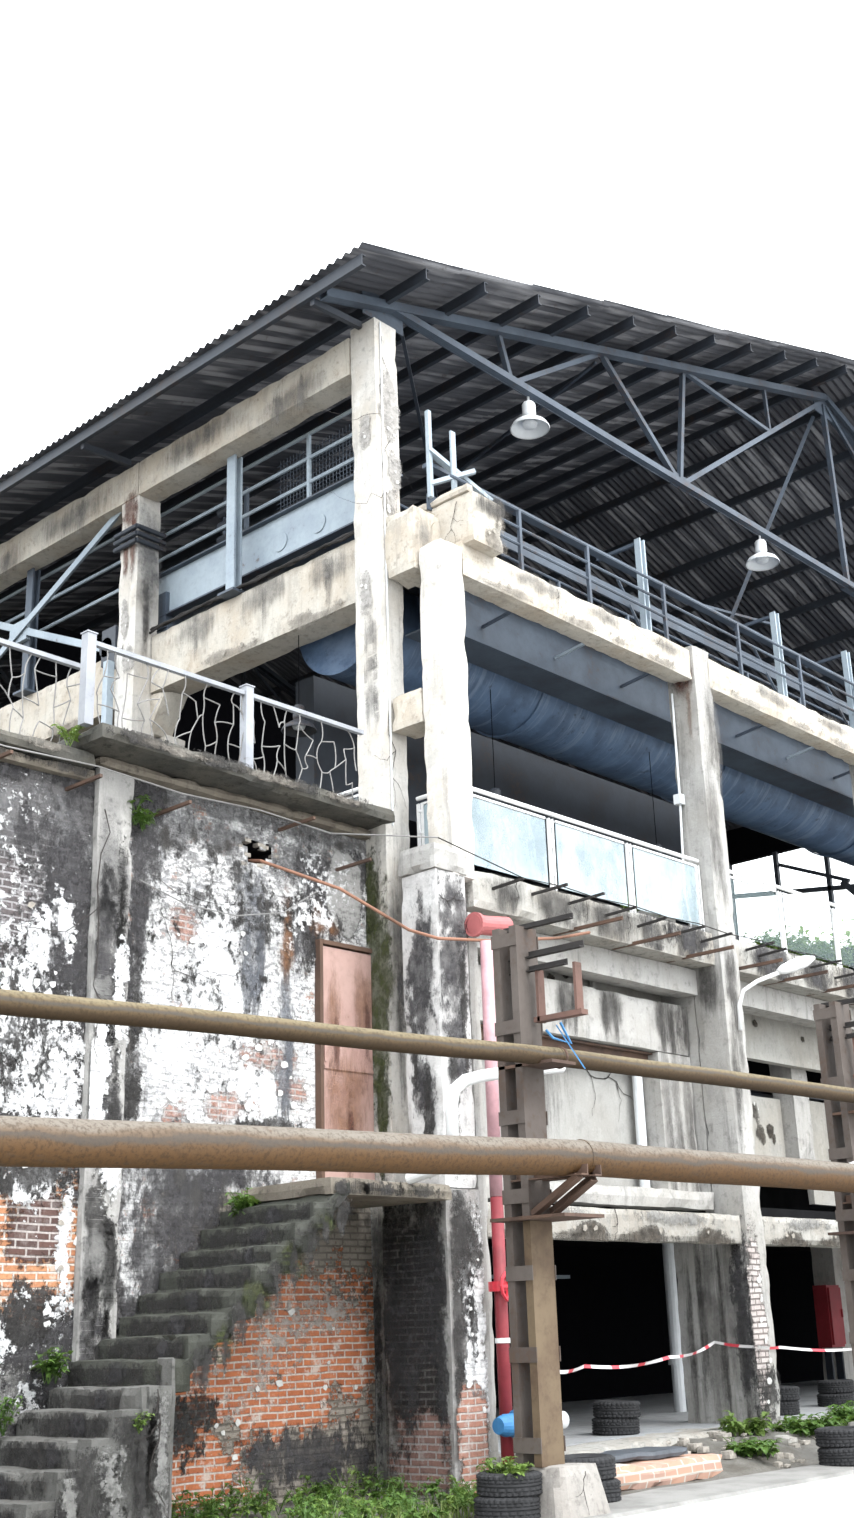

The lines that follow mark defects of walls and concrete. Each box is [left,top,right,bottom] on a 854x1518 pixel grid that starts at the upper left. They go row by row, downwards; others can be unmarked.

spalling [0,772,91,996]
water stain [0,746,472,1039]
peeling [153,826,367,1021]
water stain [0,1015,162,1121]
peeling [0,1015,315,1125]
water stain [177,1032,313,1128]
corrosion [331,1046,362,1131]
water stain [376,1053,473,1135]
flaking render [0,1167,79,1438]
water stain [0,1167,484,1518]
flaking render [171,1241,375,1516]
spalling [552,1219,840,1425]